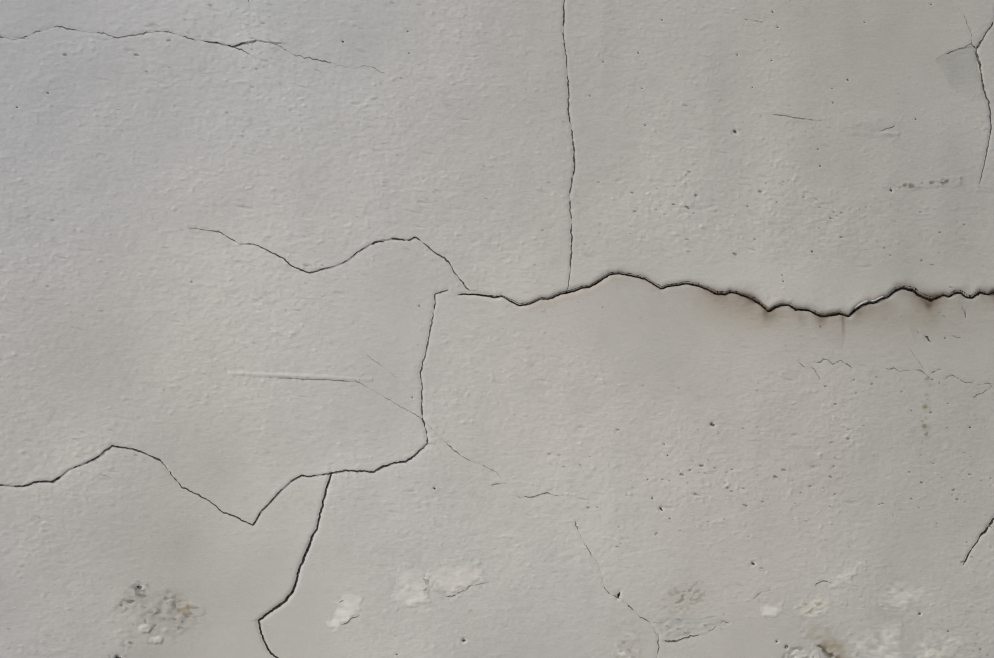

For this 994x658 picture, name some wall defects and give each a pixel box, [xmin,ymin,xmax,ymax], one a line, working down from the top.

crack [0,26,384,73]
crack [196,0,994,317]
water stain [580,294,994,360]
crack [886,349,992,397]
crack [0,474,63,487]
crack [74,290,502,658]
crack [963,518,994,565]
flaking render [110,577,211,652]
flaking render [325,591,364,633]
flaking render [386,554,499,611]
crack [575,521,728,653]
flaking render [776,575,937,658]